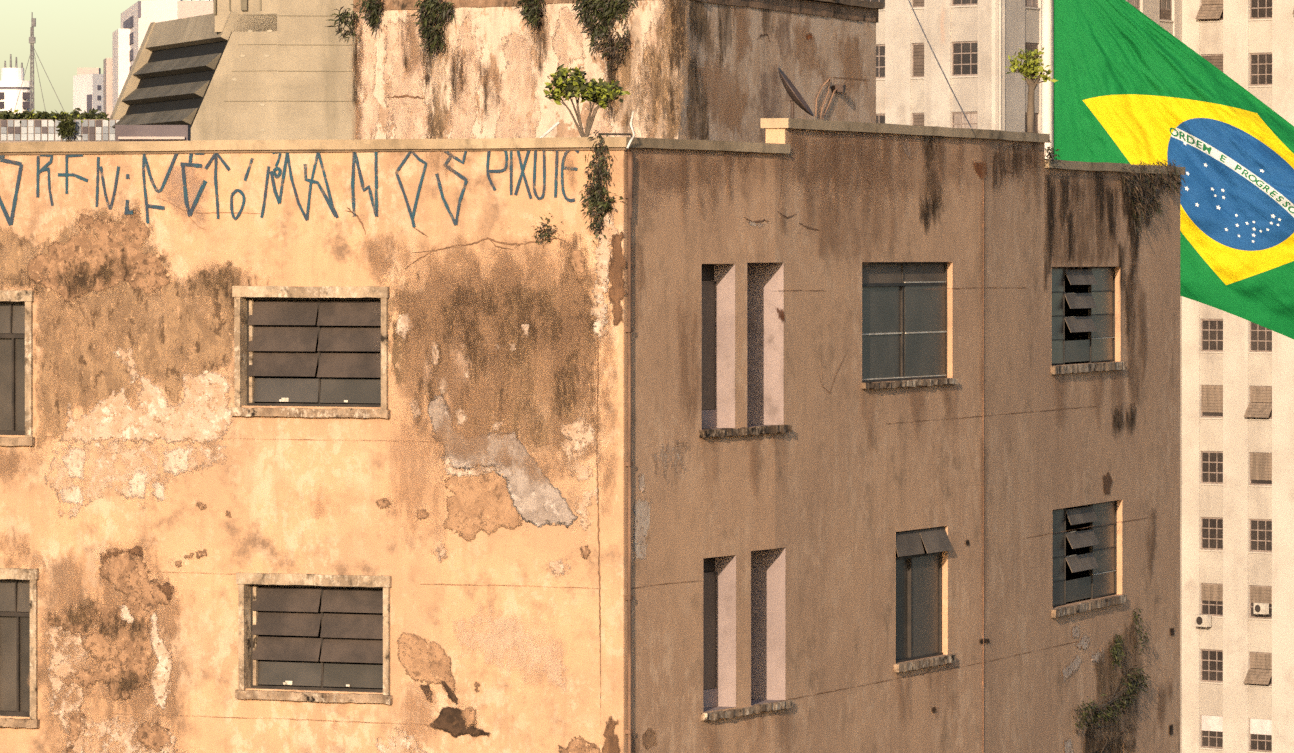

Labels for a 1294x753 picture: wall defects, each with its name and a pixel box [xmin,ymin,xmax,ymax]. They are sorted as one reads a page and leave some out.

leakage [401,8,464,139]
leakage [531,4,548,71]
leakage [607,0,773,140]
leakage [0,208,251,446]
flaking render [44,347,233,519]
leakage [368,242,394,271]
leakage [388,238,608,479]
spalling [396,280,600,575]
peeling [561,207,618,341]
leakage [993,142,1162,432]
peeling [43,544,180,753]
spalling [396,632,490,738]